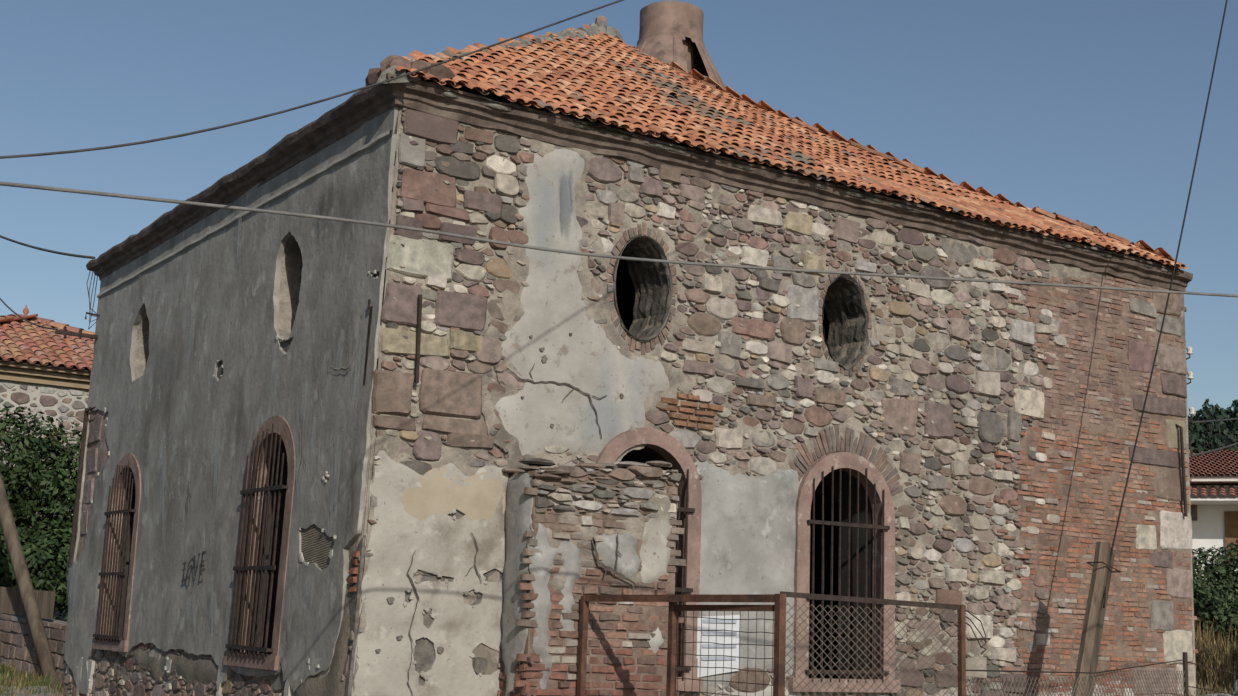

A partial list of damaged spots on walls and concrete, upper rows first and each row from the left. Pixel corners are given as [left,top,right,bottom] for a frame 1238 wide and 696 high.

crack [507,363,607,439]
flaking render [298,524,337,571]
flaking render [340,535,366,696]
spalling [386,572,452,619]
spalling [463,569,503,608]
flaking render [76,657,96,696]
flaking render [284,658,321,696]
spalling [396,635,445,685]
spalling [469,643,500,676]
flaking render [646,628,664,653]